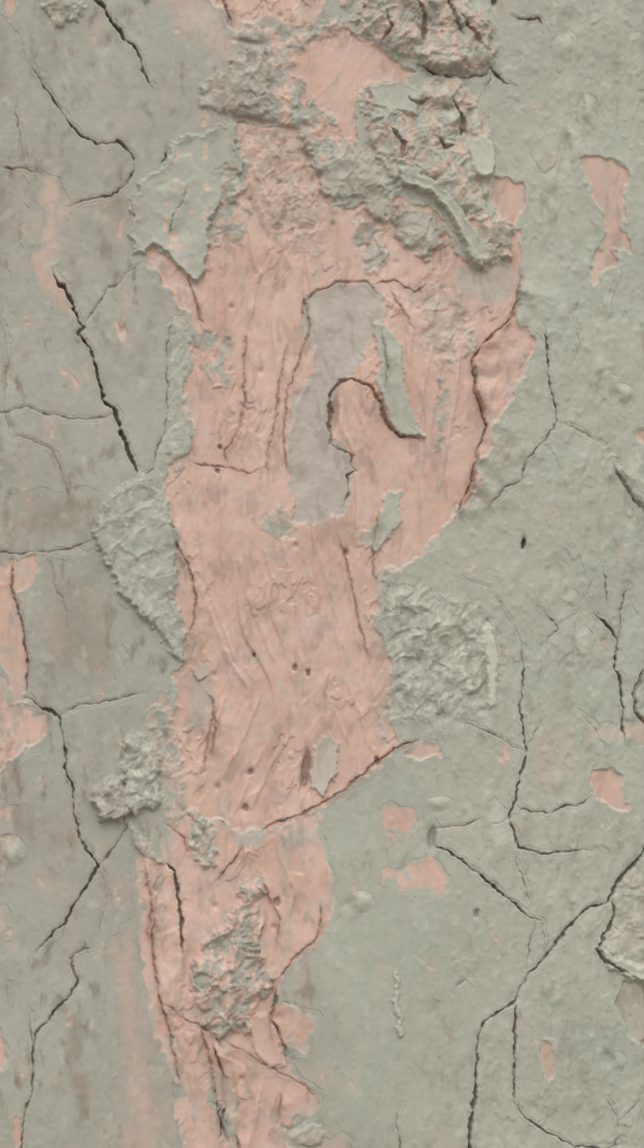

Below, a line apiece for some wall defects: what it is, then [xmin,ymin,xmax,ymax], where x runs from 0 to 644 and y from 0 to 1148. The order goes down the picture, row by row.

crack [0,61,174,212]
crack [91,0,158,92]
peeling [578,155,633,286]
crack [484,319,607,523]
peeling [0,556,53,778]
crack [0,257,271,1148]
peeling [127,0,543,1148]
crack [254,737,428,837]
crack [427,560,644,1148]
crack [393,1101,405,1148]